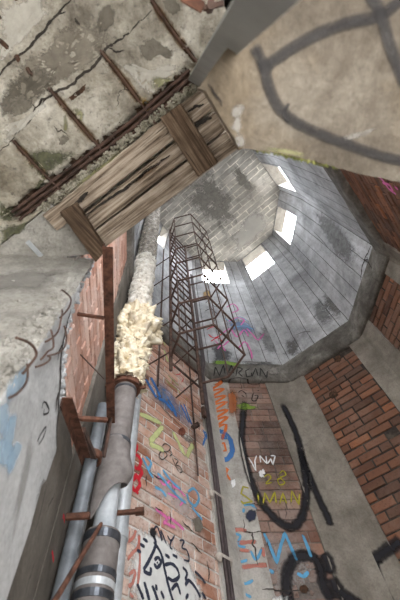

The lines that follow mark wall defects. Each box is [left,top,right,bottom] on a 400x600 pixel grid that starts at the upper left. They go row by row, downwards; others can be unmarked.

damp [0,68,56,116]
crack [0,0,152,151]
spalling [0,0,201,221]
damp [96,5,115,33]
damp [140,39,172,61]
damp [190,174,266,250]
spalling [0,256,95,413]
crack [243,520,272,565]